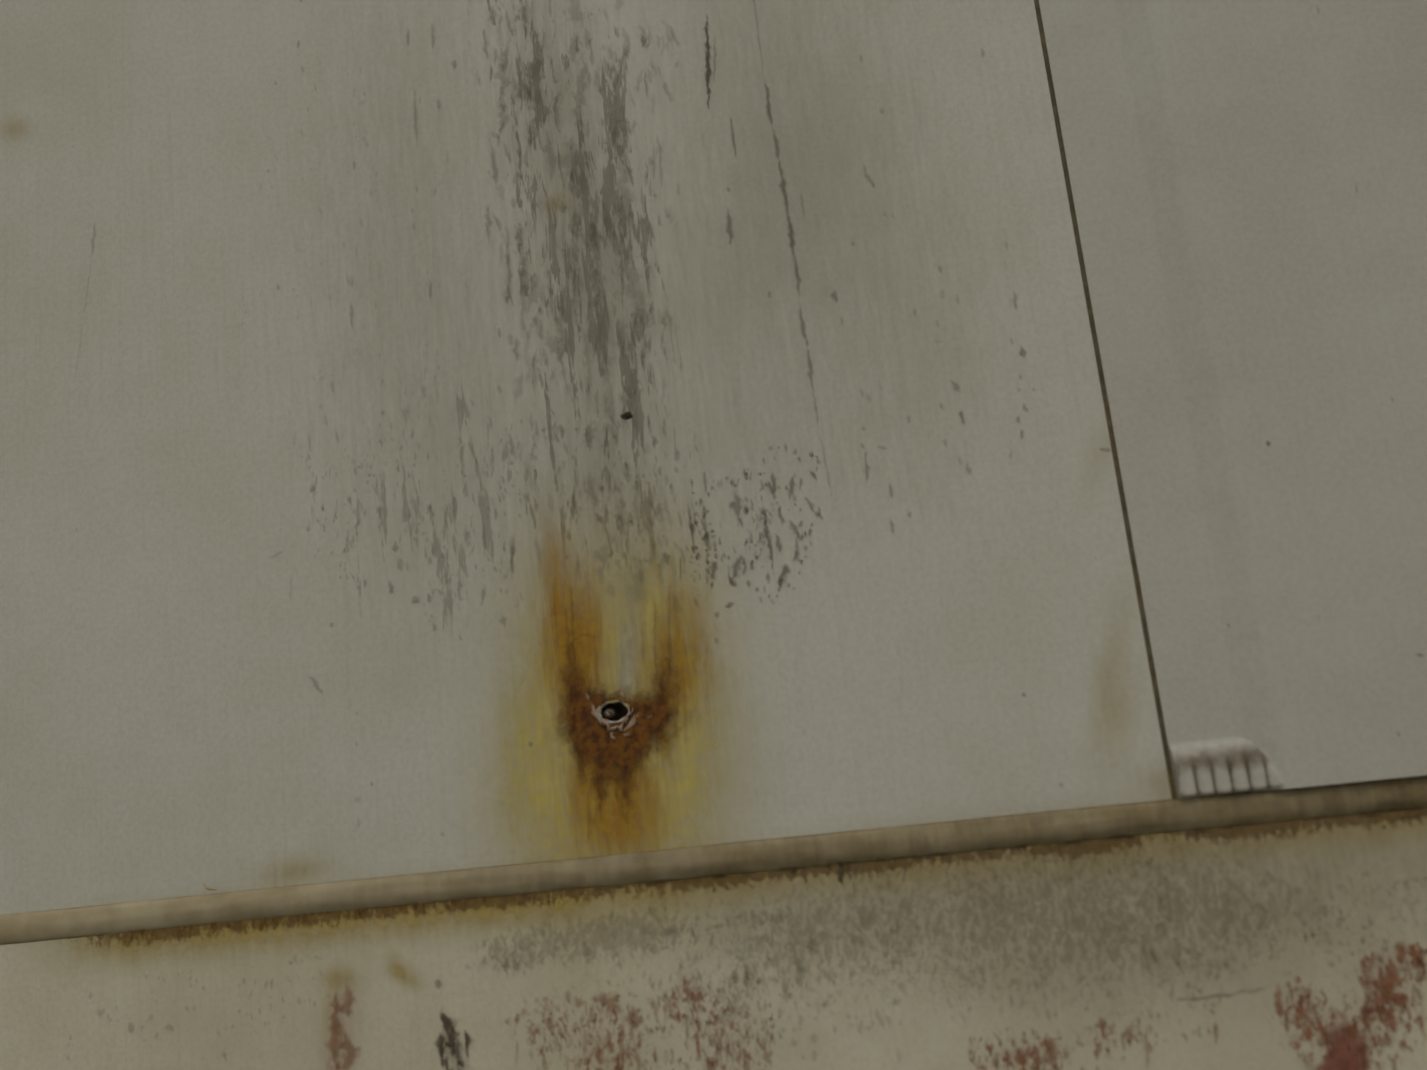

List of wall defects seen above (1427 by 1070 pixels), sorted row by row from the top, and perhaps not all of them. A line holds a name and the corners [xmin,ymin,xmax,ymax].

rust [507,558,710,861]
rust [0,807,1427,950]